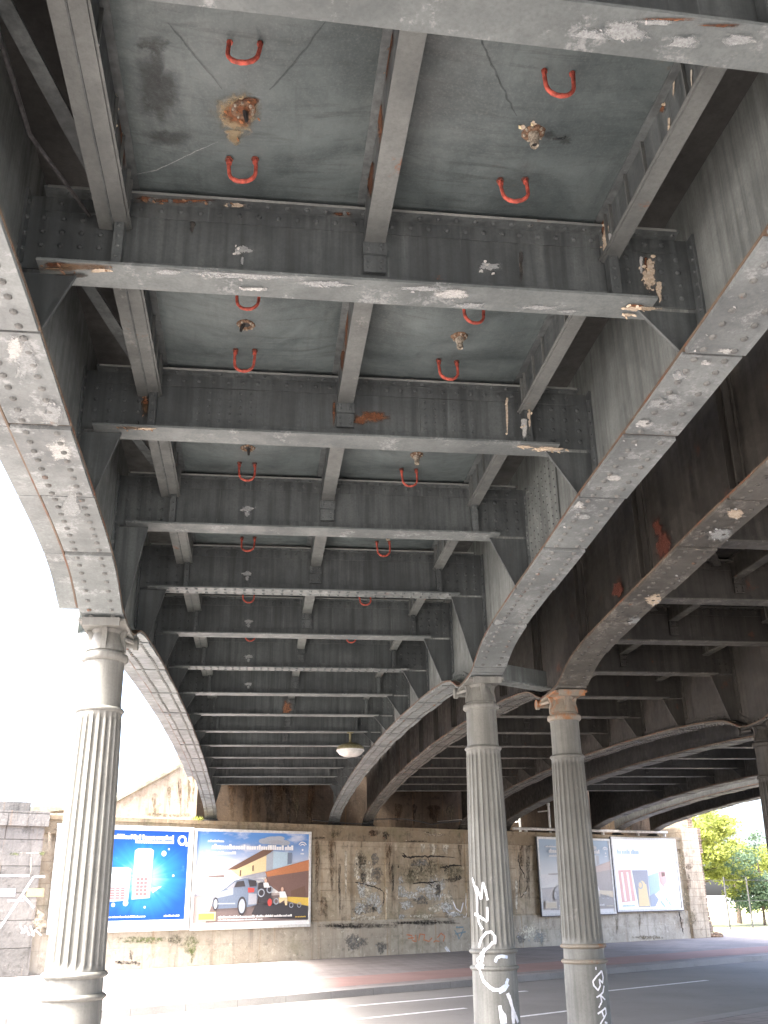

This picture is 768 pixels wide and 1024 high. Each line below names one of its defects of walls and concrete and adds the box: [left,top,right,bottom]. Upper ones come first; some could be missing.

peeling [570,20,670,43]
peeling [669,37,696,48]
peeling [725,34,755,46]
corrosion [217,94,260,145]
corrosion [136,196,243,207]
peeling [621,255,662,319]
peeling [505,398,569,453]
leakage [315,841,347,911]
leakage [351,845,394,921]
crack [402,853,461,886]